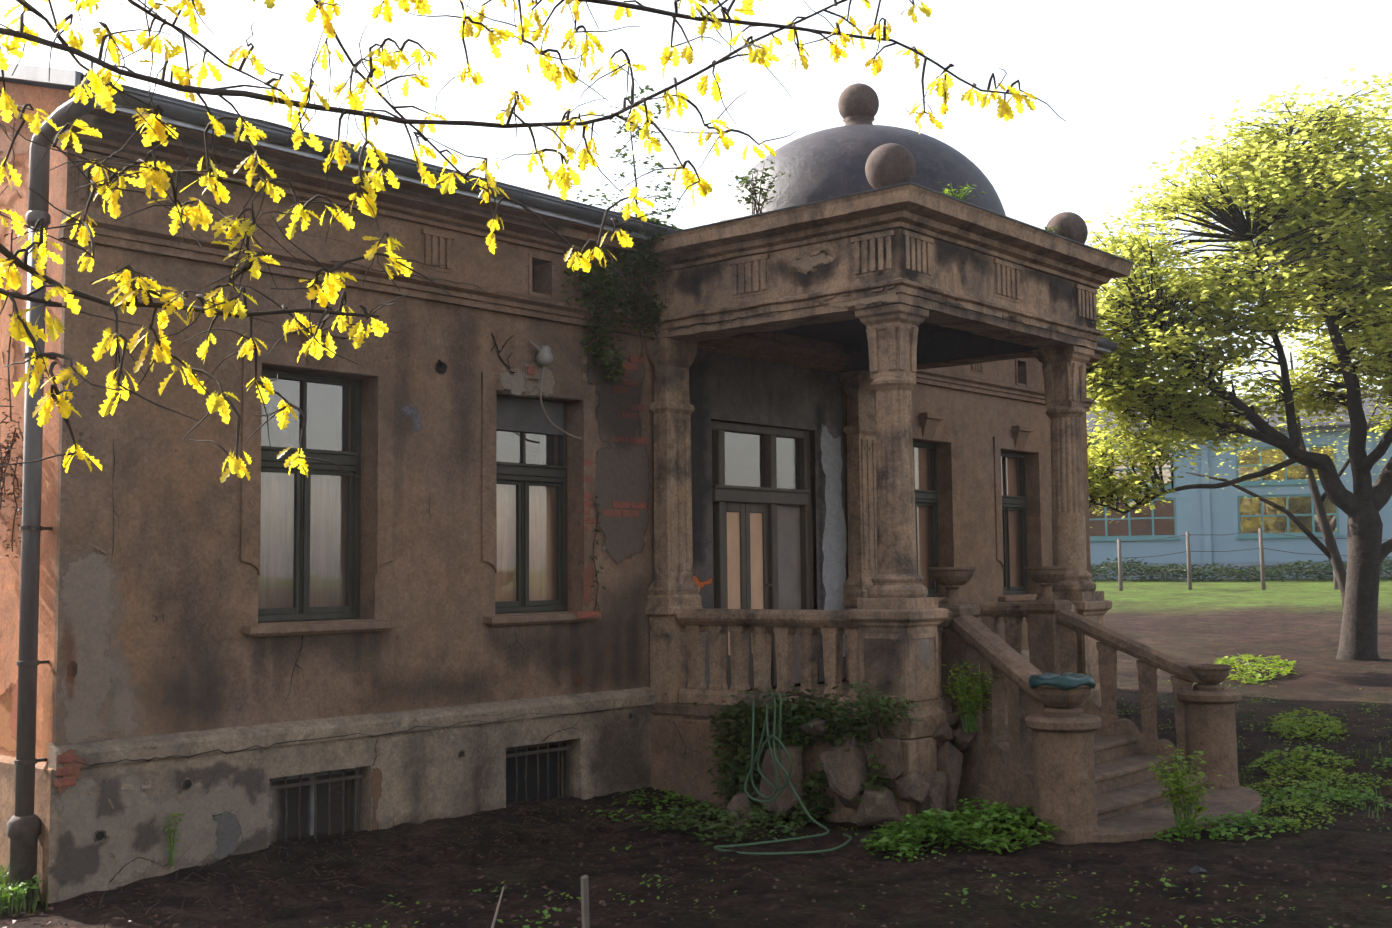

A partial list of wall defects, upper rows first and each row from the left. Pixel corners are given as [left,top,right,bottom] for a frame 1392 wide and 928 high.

peeling [821,424,847,610]
peeling [0,679,18,752]
spalling [42,544,275,902]